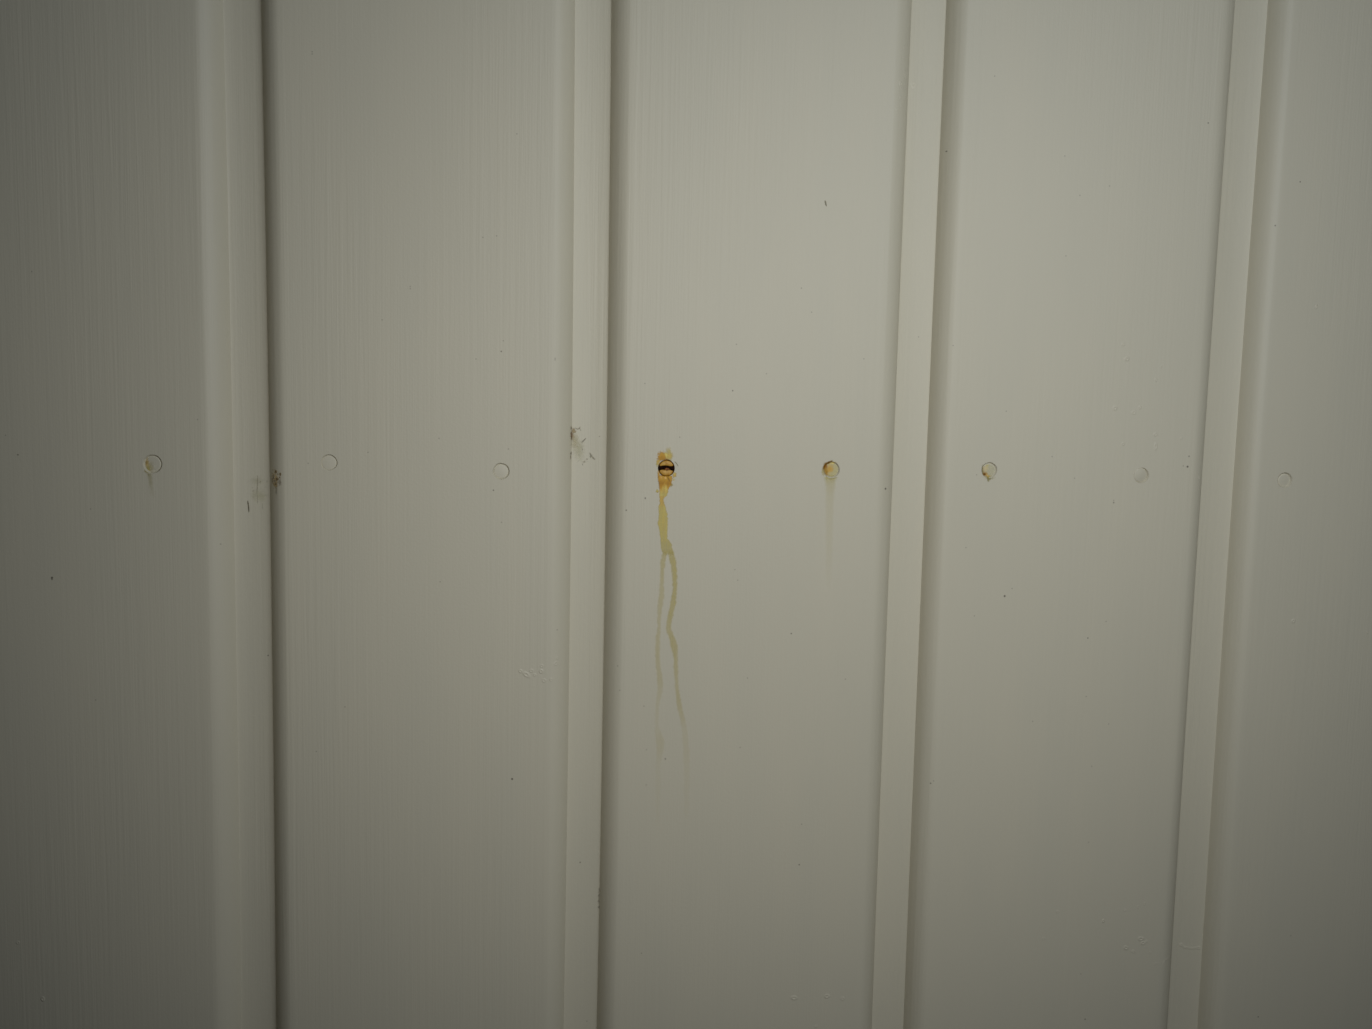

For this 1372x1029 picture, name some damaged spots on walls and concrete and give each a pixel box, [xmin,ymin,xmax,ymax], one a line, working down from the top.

corrosion [656,450,676,579]
corrosion [822,461,838,478]